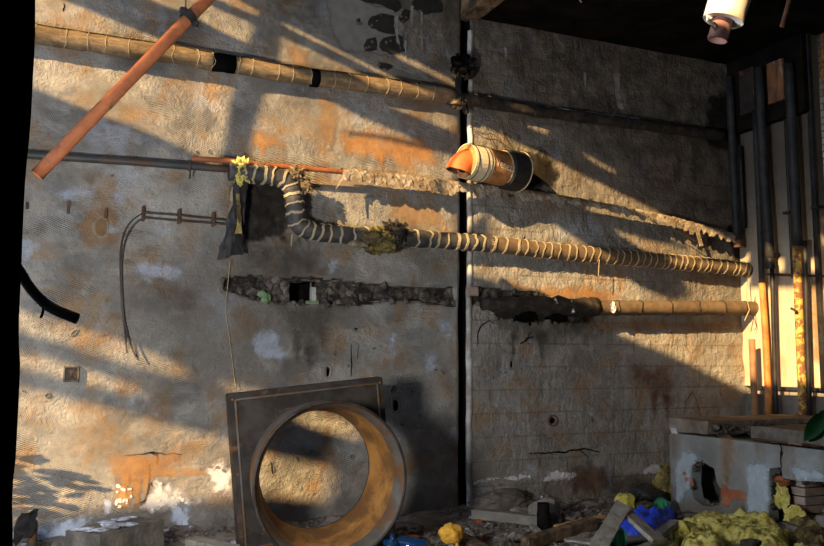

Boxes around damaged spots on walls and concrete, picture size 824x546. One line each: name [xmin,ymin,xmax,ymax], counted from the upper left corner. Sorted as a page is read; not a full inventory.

peeling [356,0,443,70]
rust [113,456,176,505]
crack [529,448,600,458]
peeling [720,464,770,515]
peeling [793,467,823,480]